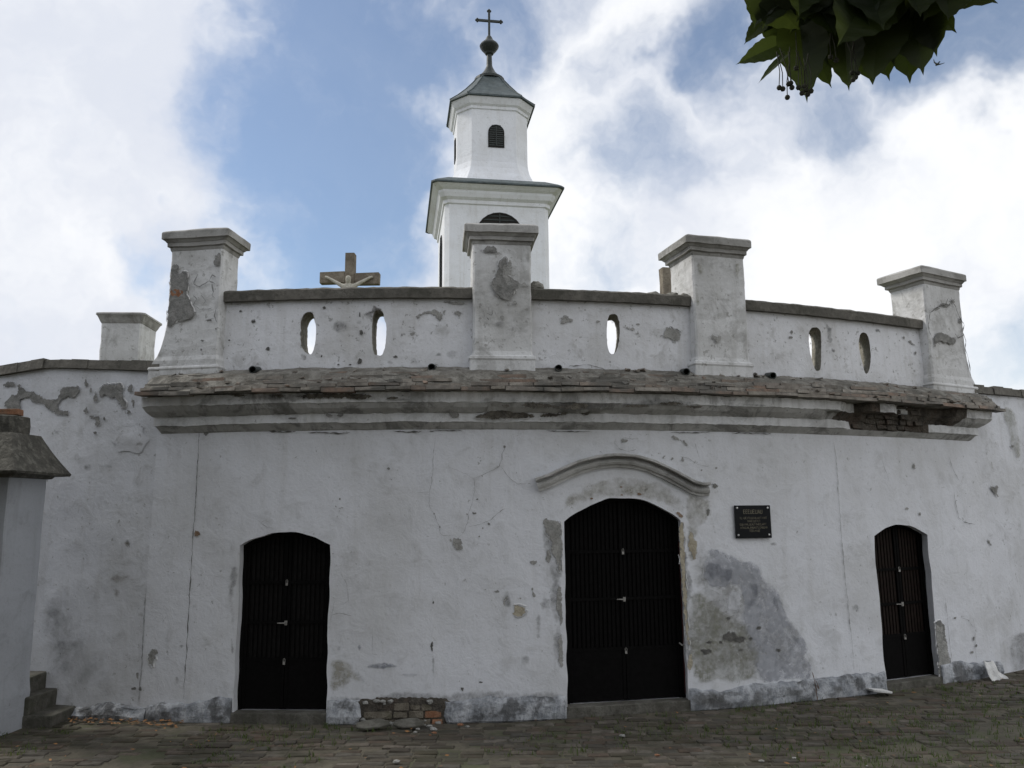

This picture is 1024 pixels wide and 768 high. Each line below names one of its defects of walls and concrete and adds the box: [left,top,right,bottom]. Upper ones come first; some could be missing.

spalling [166,264,196,328]
spalling [483,246,527,318]
flaking render [934,332,956,347]
flaking render [3,380,135,434]
crack [183,439,199,699]
spalling [530,518,564,574]
spalling [676,512,761,670]
spalling [934,617,956,677]
flaking render [358,697,450,725]